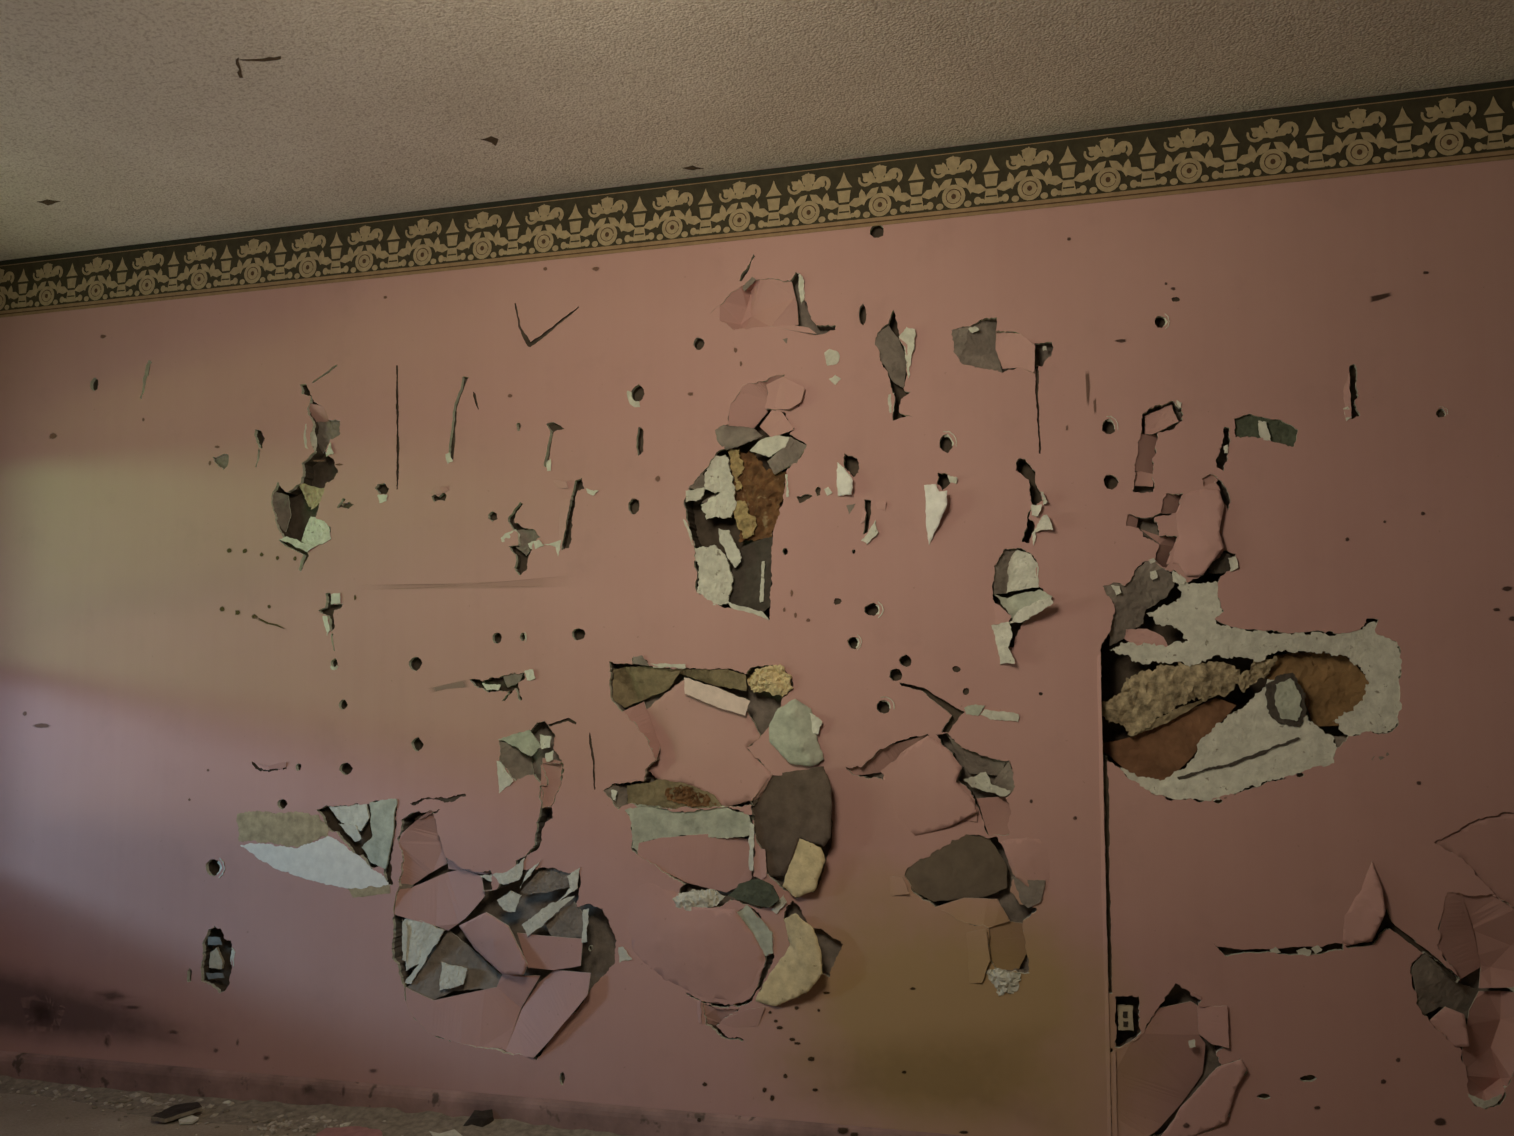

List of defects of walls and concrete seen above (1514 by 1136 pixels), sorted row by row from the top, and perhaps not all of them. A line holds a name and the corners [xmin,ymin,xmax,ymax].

crack [515,303,579,347]
spalling [859,304,916,421]
spalling [951,317,1053,373]
spalling [271,384,340,552]
spalling [683,374,807,621]
spalling [991,458,1053,664]
spalling [1100,400,1402,804]
spalling [236,734,632,1060]
spalling [603,655,793,956]
spalling [846,733,1051,996]
crack [1213,862,1461,983]
spalling [1110,983,1247,1136]